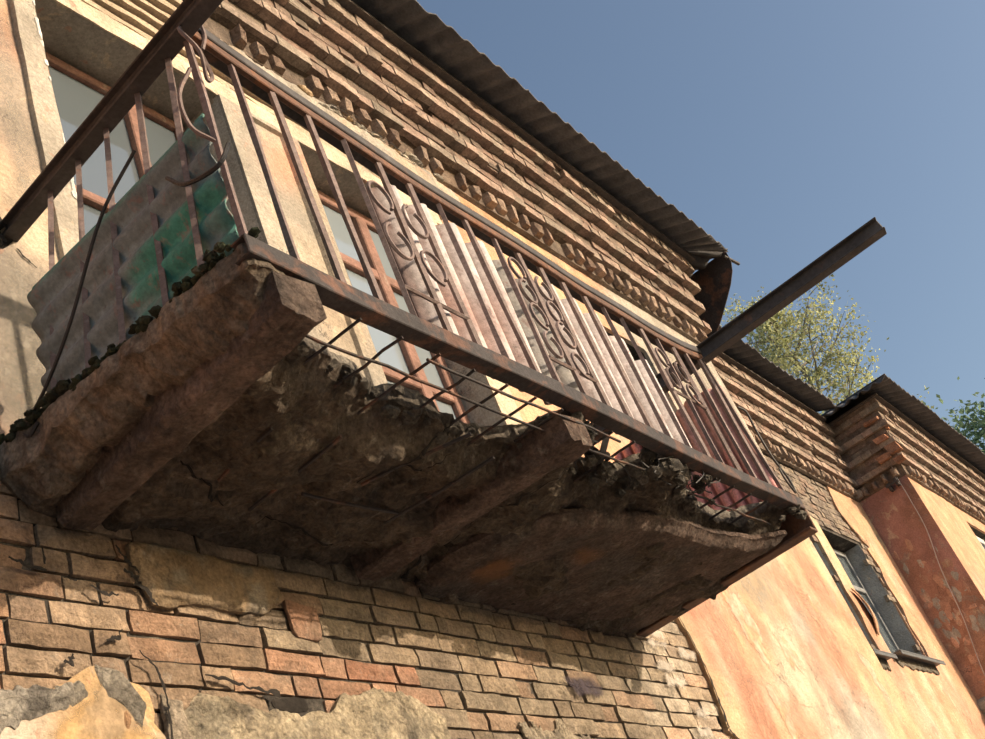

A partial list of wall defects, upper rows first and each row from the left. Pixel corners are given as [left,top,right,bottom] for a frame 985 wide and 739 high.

crack [180,460,224,506]
flaking render [0,317,897,739]